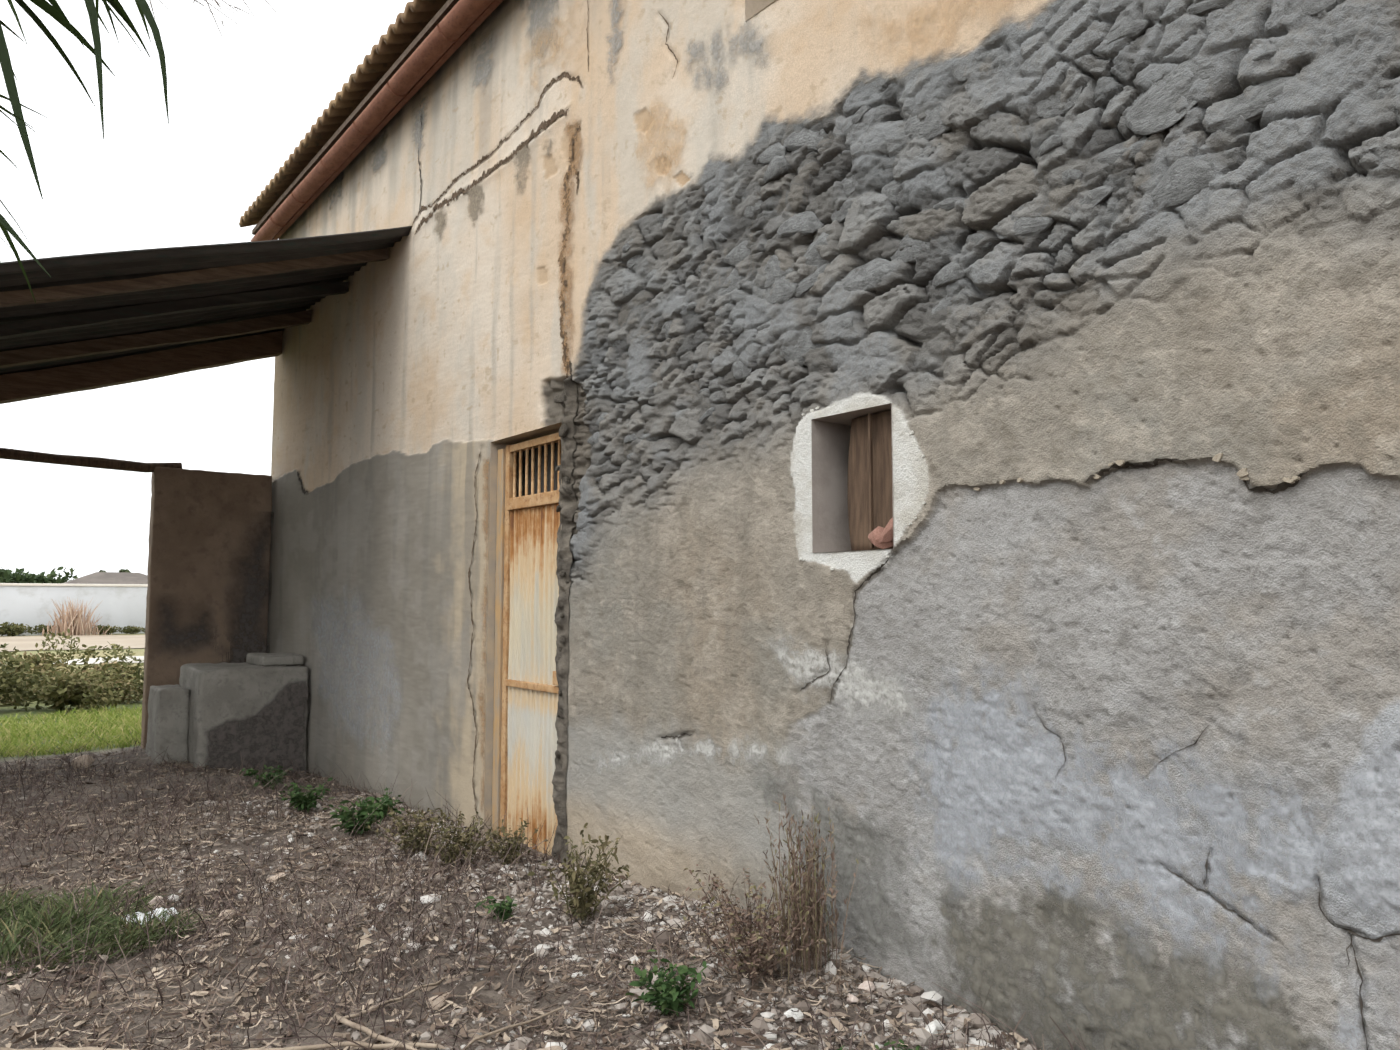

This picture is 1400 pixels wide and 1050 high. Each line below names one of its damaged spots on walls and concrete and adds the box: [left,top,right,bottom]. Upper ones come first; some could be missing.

crack [412,0,589,383]
flaking render [633,106,654,135]
flaking render [653,152,690,188]
crack [467,446,482,827]
crack [800,553,893,702]
spalling [772,453,1400,1050]
crack [1162,850,1274,940]
crack [1318,879,1400,1050]